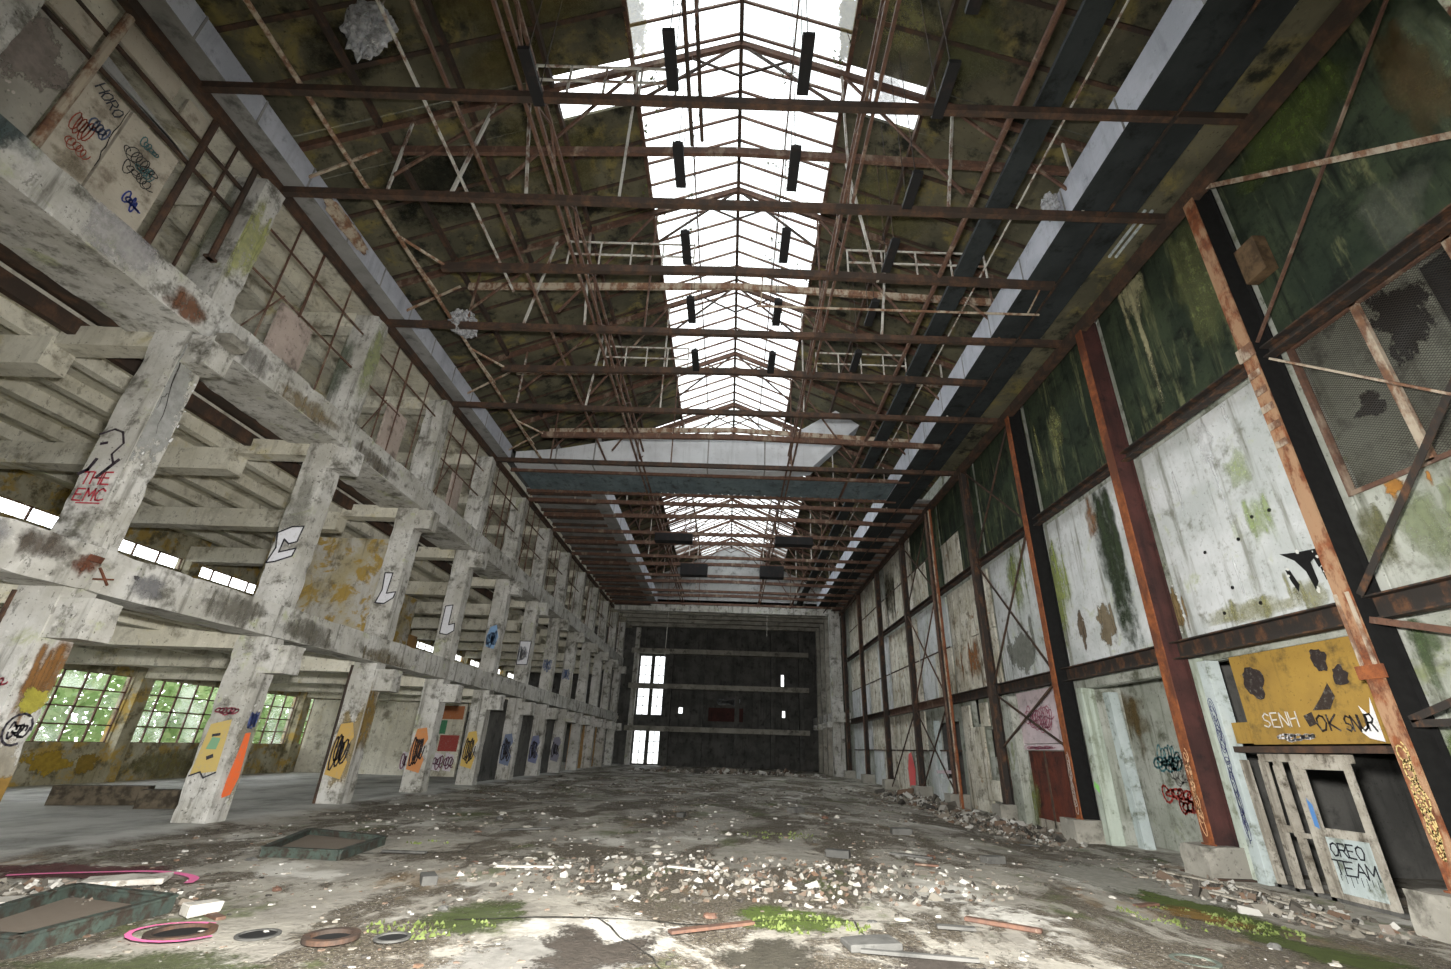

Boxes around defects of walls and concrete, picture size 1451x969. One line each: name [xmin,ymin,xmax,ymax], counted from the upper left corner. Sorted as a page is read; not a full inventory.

leakage [1118,275,1154,370]
leakage [1169,225,1222,339]
leakage [1092,488,1139,645]
rust [1384,478,1403,498]
leakage [1358,483,1451,559]